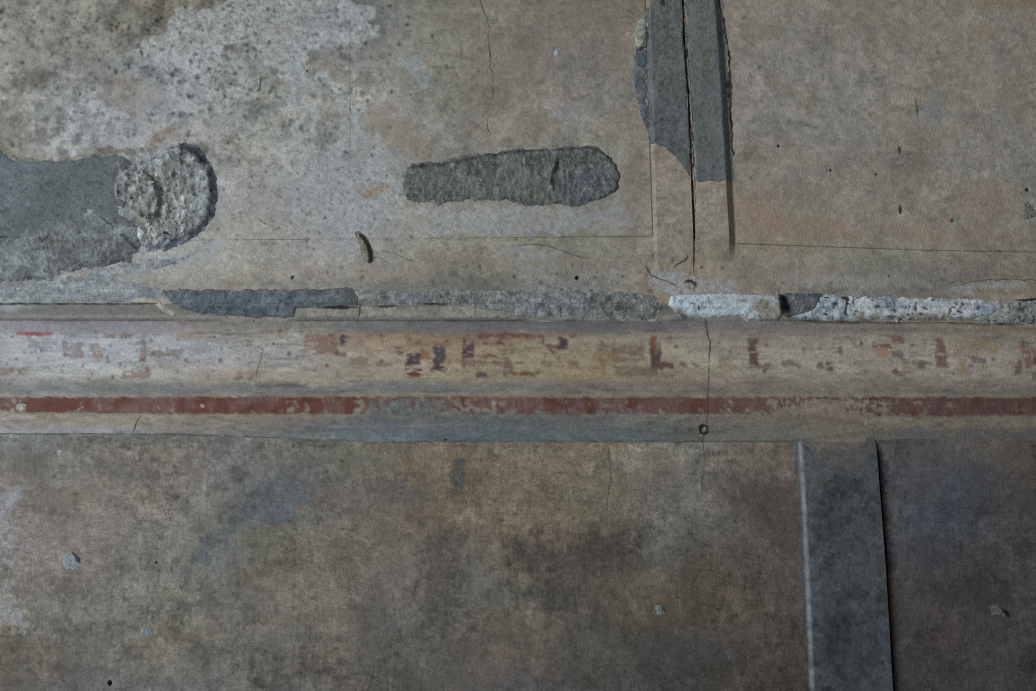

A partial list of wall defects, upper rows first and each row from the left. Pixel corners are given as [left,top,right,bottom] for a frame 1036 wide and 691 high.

spalling [668,280,1036,324]